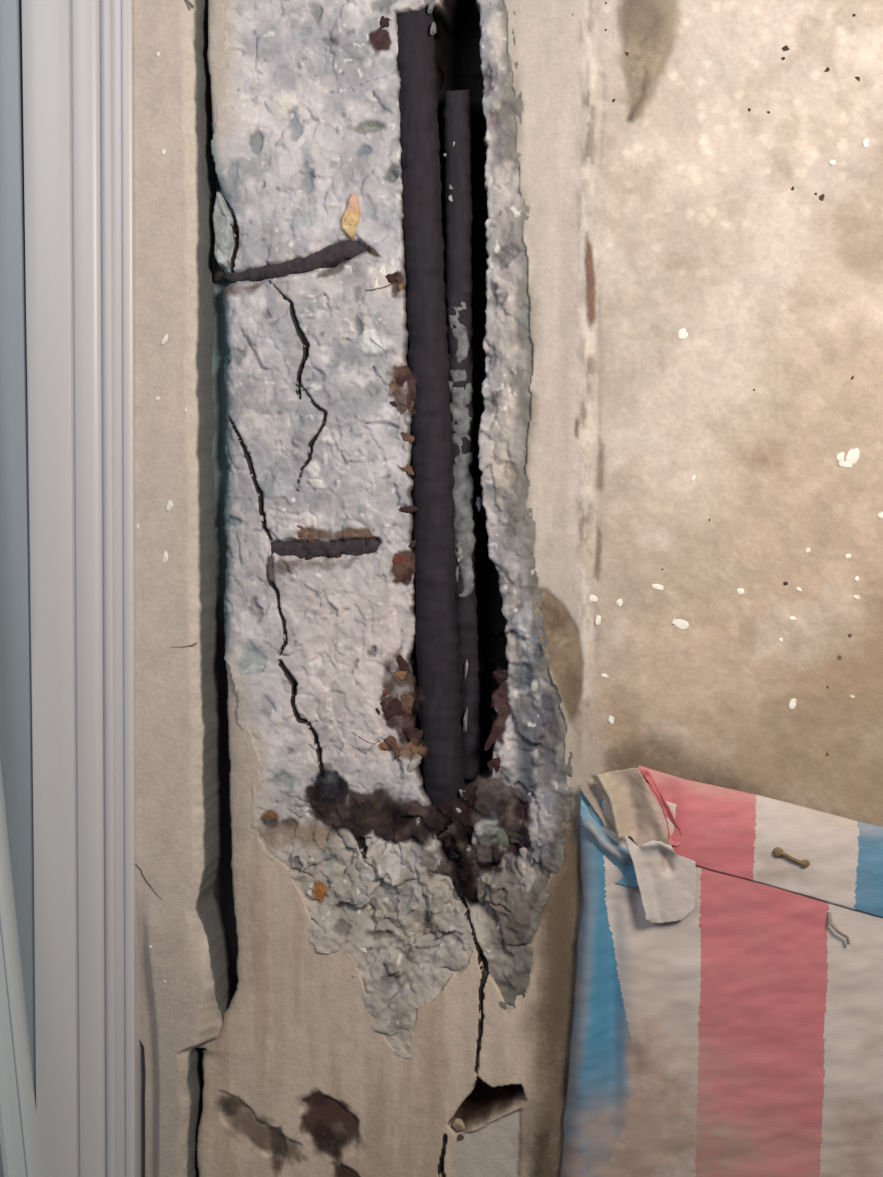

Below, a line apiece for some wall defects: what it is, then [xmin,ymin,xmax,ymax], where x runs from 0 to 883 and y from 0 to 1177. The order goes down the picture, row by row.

water stain [619,0,676,118]
corrosion [318,260,349,277]
crack [170,174,328,993]
corrosion [268,525,380,582]
spalling [211,0,581,1058]
corrosion [375,653,425,759]
corrosion [261,669,537,945]
crack [452,880,489,1073]
crack [438,1134,447,1177]
spalling [452,1078,515,1140]